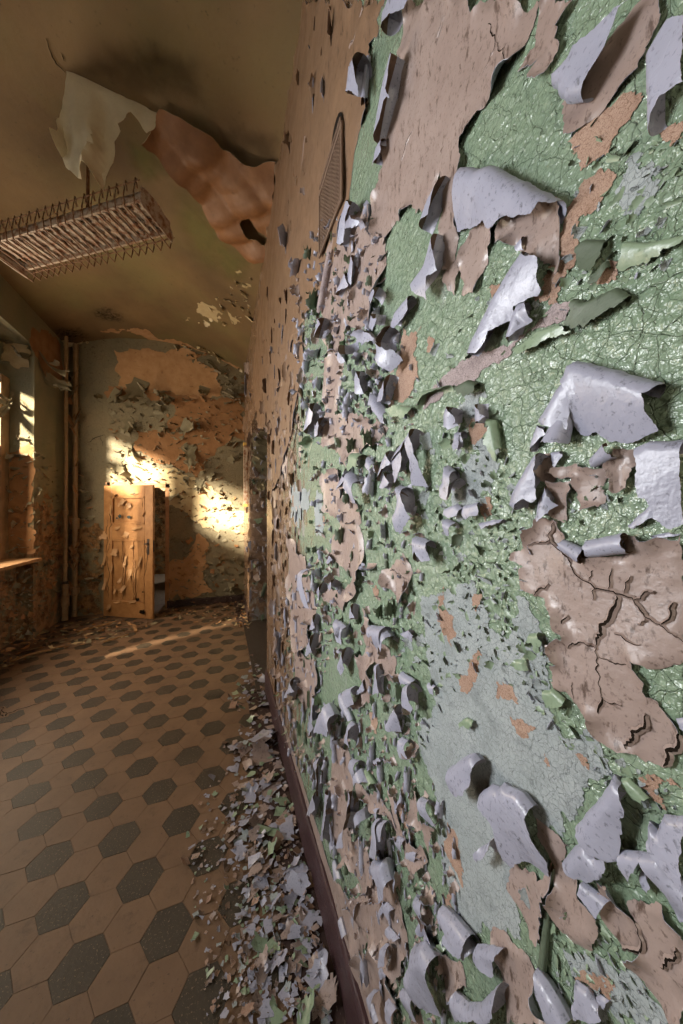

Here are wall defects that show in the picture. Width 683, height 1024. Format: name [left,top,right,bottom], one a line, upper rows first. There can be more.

peeling [609,151,668,226]
peeling [196,277,253,327]
peeling [511,287,632,356]
peeling [0,327,89,439]
peeling [530,361,666,452]
peeling [5,435,37,555]
spalling [68,473,136,615]
peeling [166,533,244,601]
peeling [366,520,392,553]
peeling [378,553,423,625]
peeling [400,627,414,652]
crack [527,521,683,768]